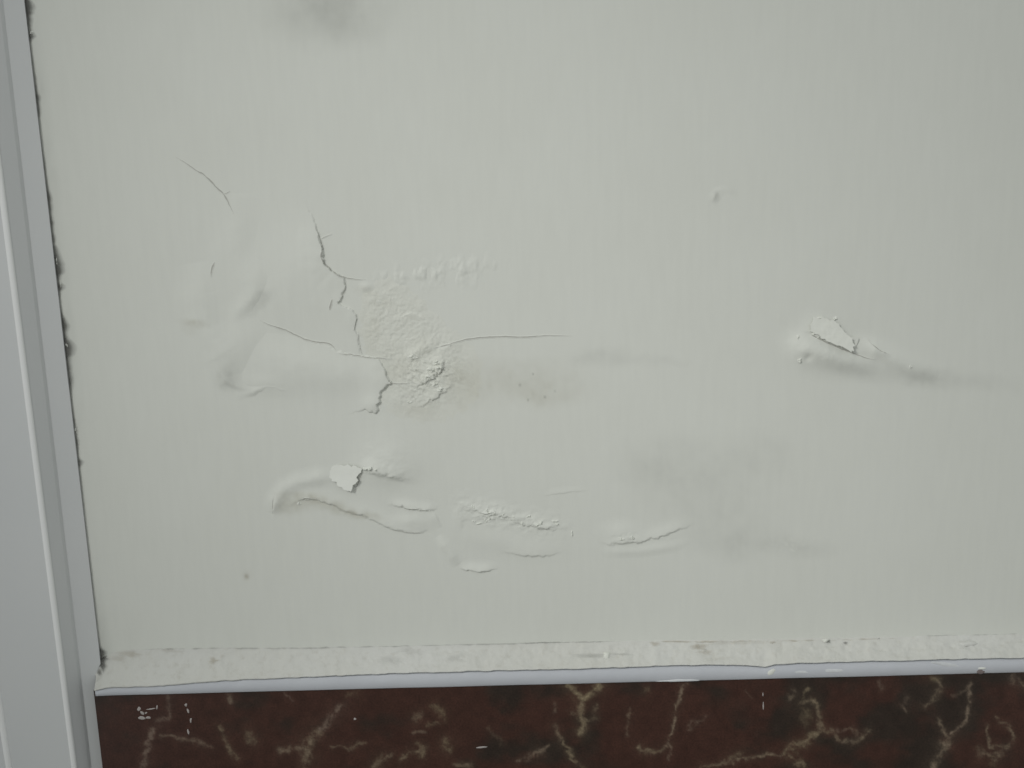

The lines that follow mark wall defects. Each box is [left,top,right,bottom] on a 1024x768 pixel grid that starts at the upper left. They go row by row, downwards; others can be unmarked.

crack [176,156,235,214]
crack [260,226,392,360]
crack [430,334,572,350]